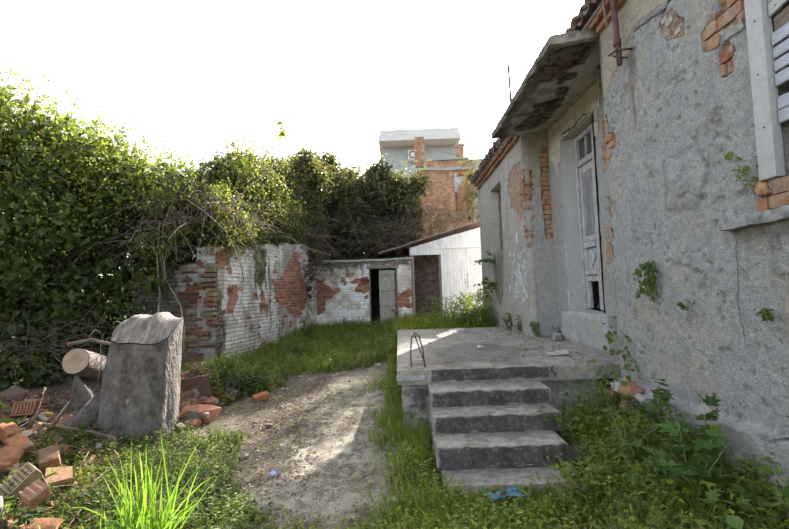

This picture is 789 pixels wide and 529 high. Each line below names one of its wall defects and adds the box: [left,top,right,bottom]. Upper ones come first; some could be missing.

spalling [660,8,684,40]
flaking render [701,0,746,77]
peeling [507,44,616,303]
flaking render [254,252,371,327]
flaking render [392,288,413,313]
crack [735,232,745,343]